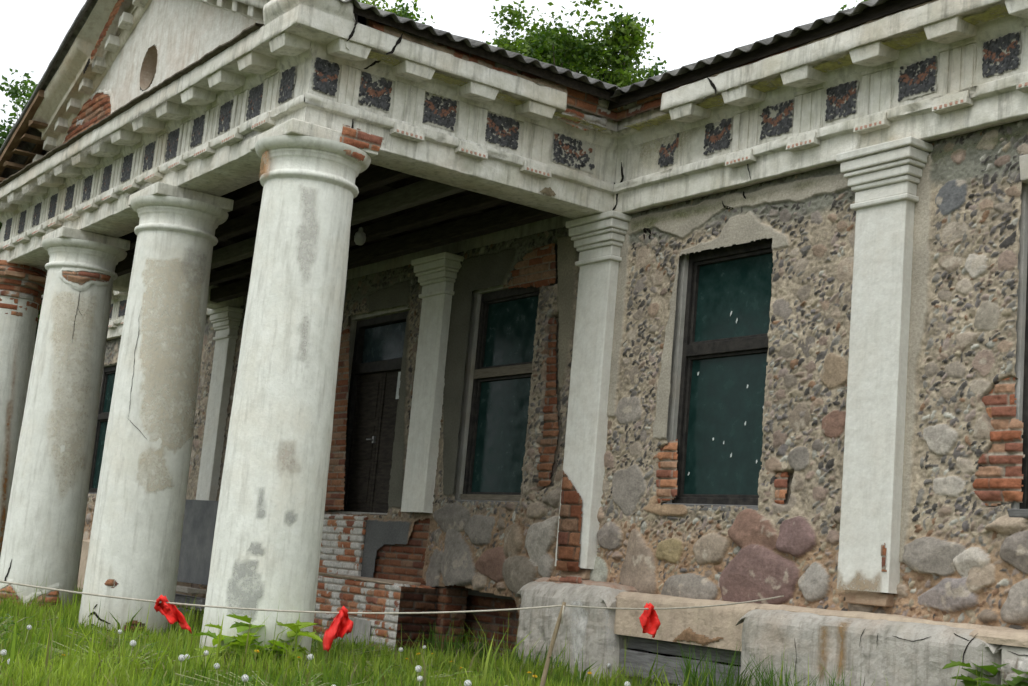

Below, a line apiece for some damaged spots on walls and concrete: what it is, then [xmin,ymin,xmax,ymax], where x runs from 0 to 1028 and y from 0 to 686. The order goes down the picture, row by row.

crack [347,12,358,41]
crack [364,33,403,69]
spalling [62,89,114,144]
spalling [340,124,384,162]
spalling [58,267,112,291]
spalling [503,243,556,289]
spalling [537,317,583,584]
spalling [656,439,678,503]
spalling [973,377,1025,506]
spalling [0,579,64,611]
leakage [228,543,263,619]